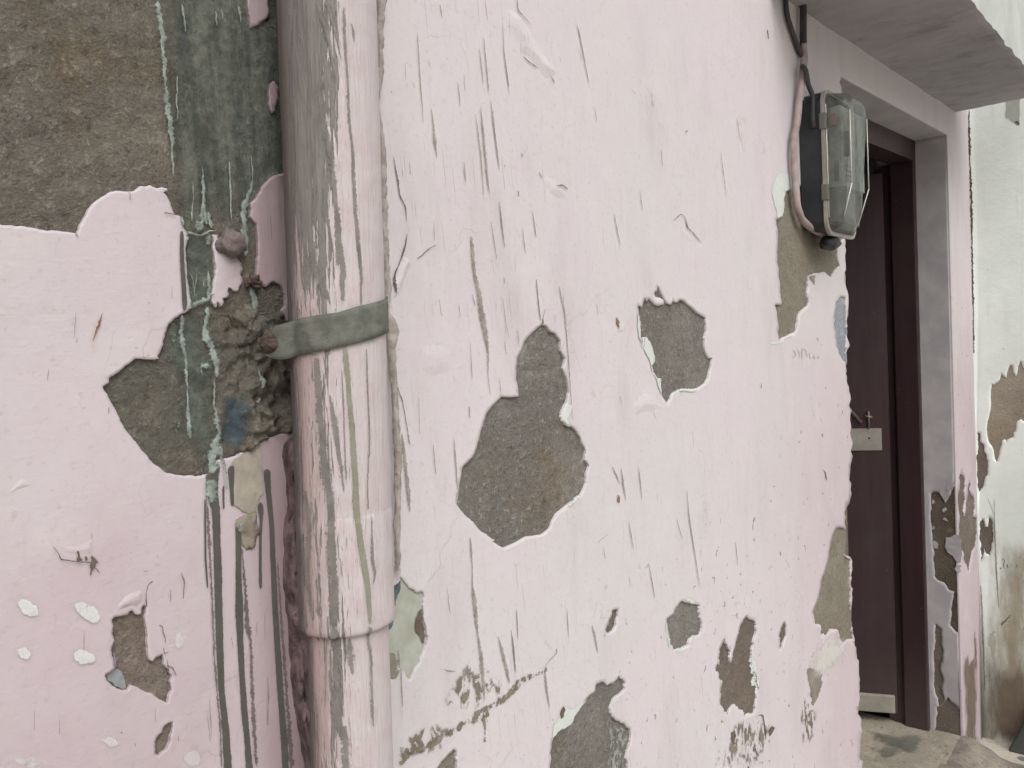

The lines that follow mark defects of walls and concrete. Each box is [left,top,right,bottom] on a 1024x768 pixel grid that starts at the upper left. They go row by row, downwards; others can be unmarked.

flaking render [0,0,293,476]
flaking render [770,172,842,344]
flaking render [637,289,711,402]
flaking render [457,325,587,547]
flaking render [105,606,170,702]
flaking render [389,566,427,679]
spalling [399,666,547,768]
flaking render [550,678,629,768]
flaking render [665,597,702,653]
flaking render [716,617,775,768]
flaking render [813,528,853,642]
flaking render [931,361,1024,736]